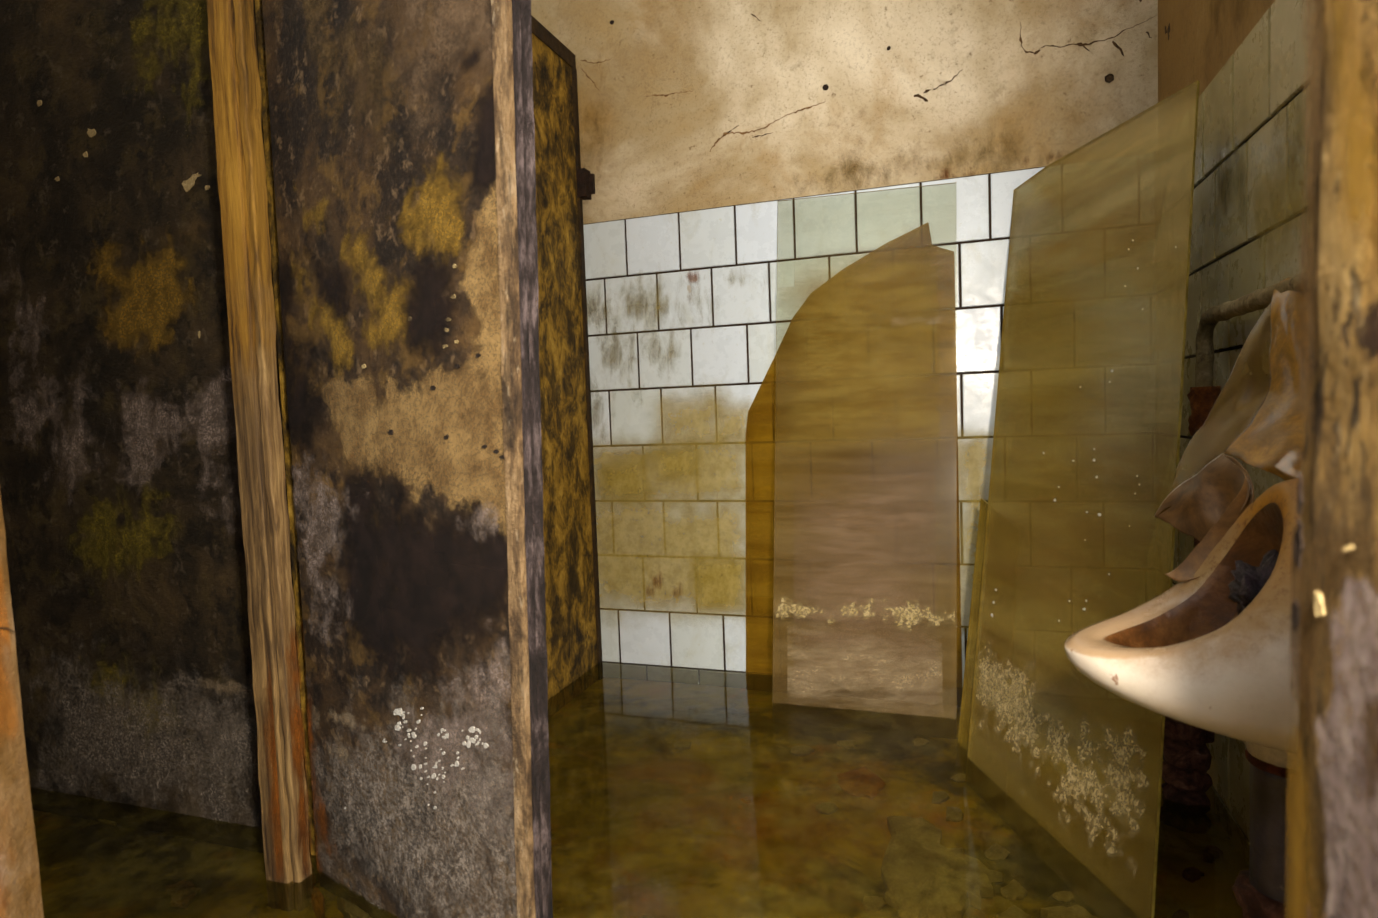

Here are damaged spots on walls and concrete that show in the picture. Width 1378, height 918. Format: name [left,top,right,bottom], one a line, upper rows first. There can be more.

crack [710,102,824,152]
crack [1009,0,1155,56]
water stain [1339,42,1378,238]
water stain [279,156,508,676]
spalling [1293,472,1304,569]
water stain [34,661,256,914]
water stain [311,643,517,918]
peeling [1291,577,1378,918]